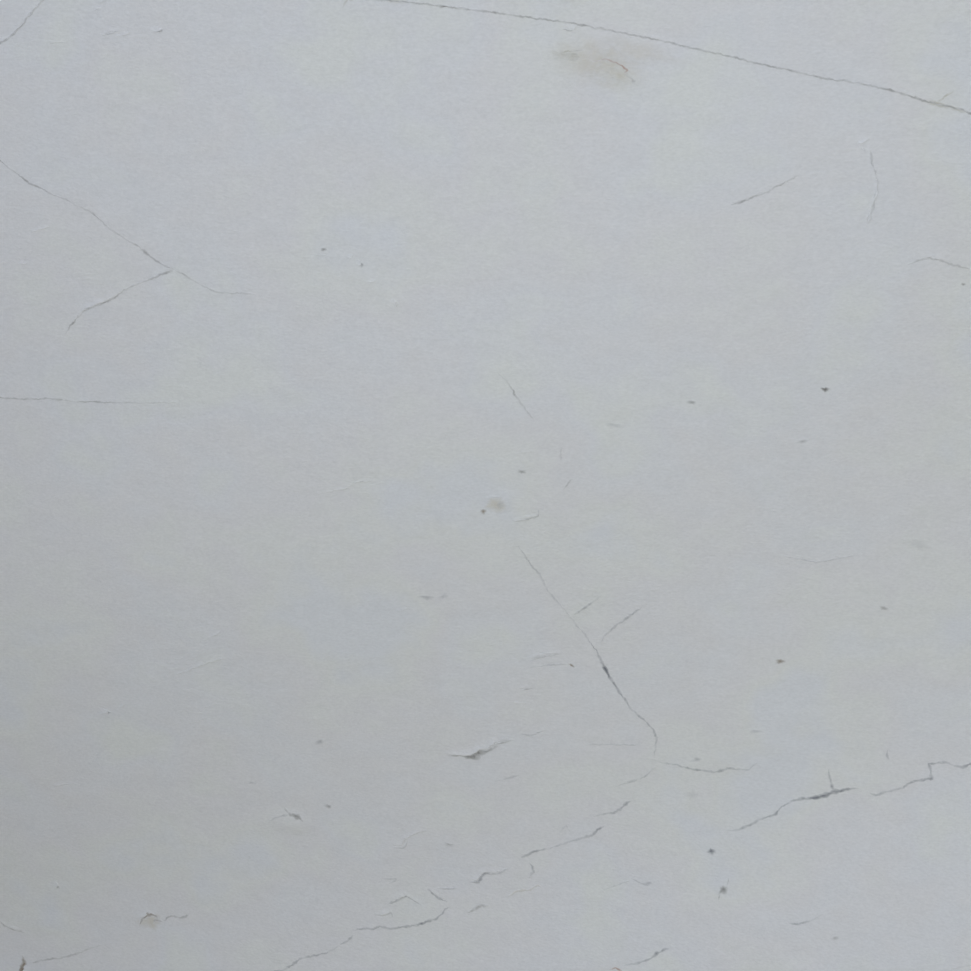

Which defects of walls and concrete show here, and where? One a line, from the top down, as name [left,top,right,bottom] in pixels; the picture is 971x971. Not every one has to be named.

crack [342,0,971,115]
crack [0,160,255,335]
crack [511,546,757,858]
crack [722,760,971,832]
crack [269,935,353,971]